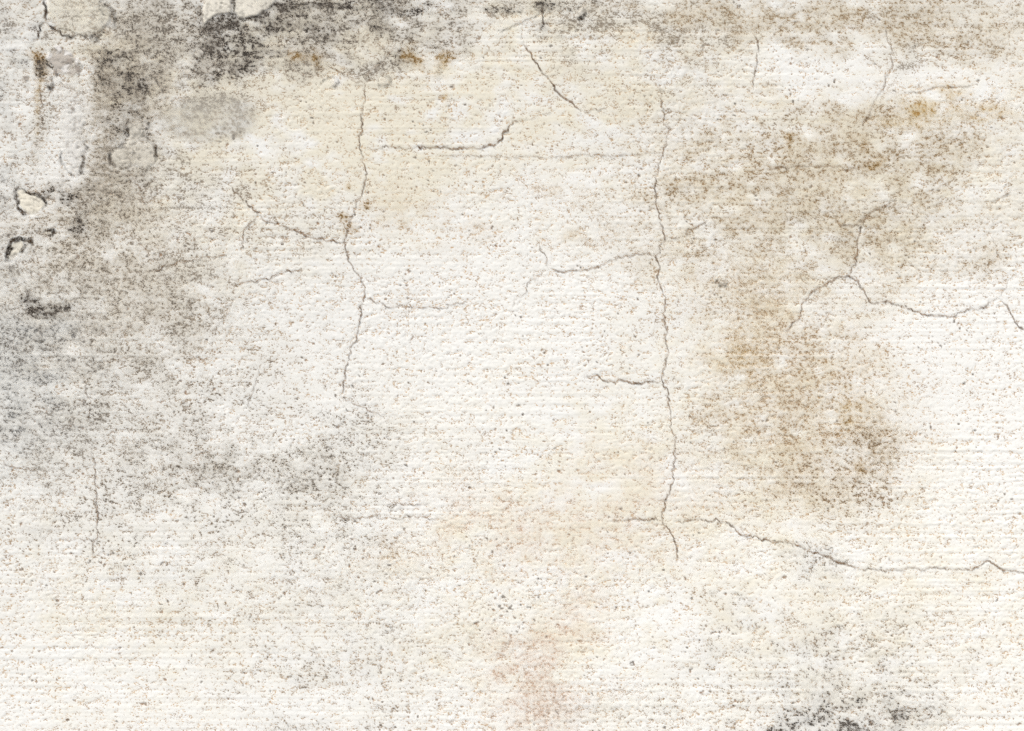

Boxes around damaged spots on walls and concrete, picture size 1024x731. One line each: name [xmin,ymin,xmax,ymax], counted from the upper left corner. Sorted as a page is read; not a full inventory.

water stain [90,31,150,183]
water stain [188,0,432,83]
crack [526,47,578,108]
water stain [0,294,70,366]
water stain [42,186,86,237]
crack [156,67,538,412]
crack [539,100,891,572]
water stain [696,280,911,518]
crack [788,200,1022,330]
crack [929,560,1024,573]